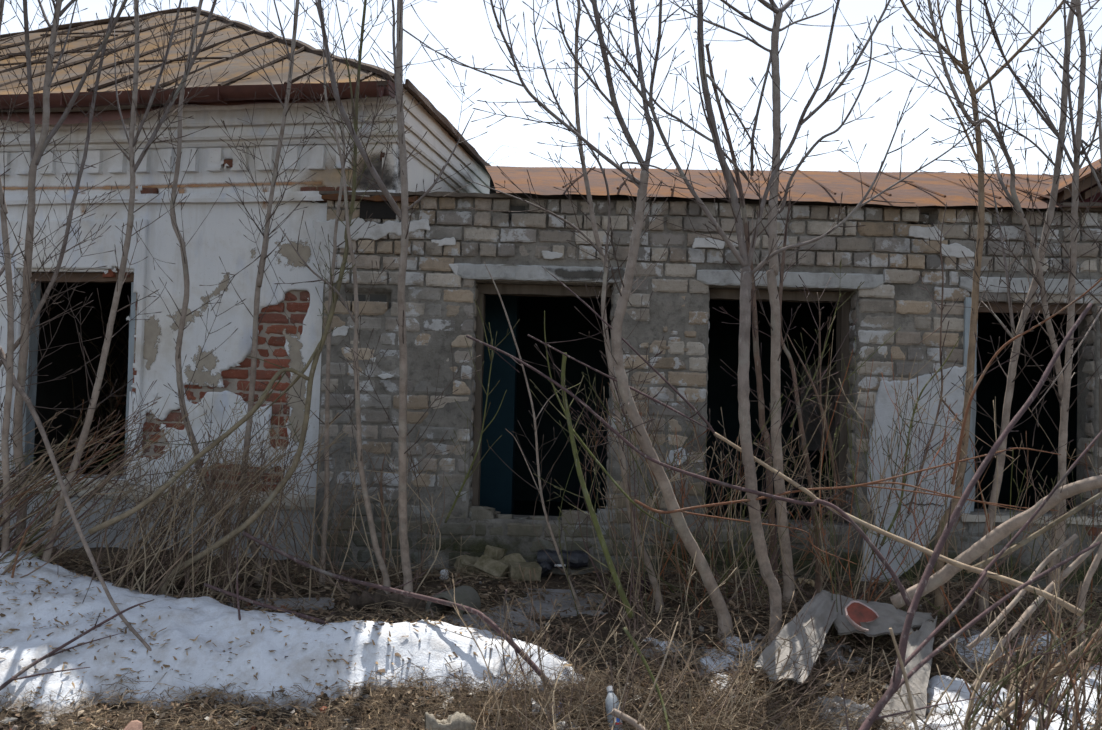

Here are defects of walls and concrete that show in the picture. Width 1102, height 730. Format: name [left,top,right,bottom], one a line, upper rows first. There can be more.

peeling [275,240,311,267]
peeling [126,272,230,392]
spalling [141,290,310,461]